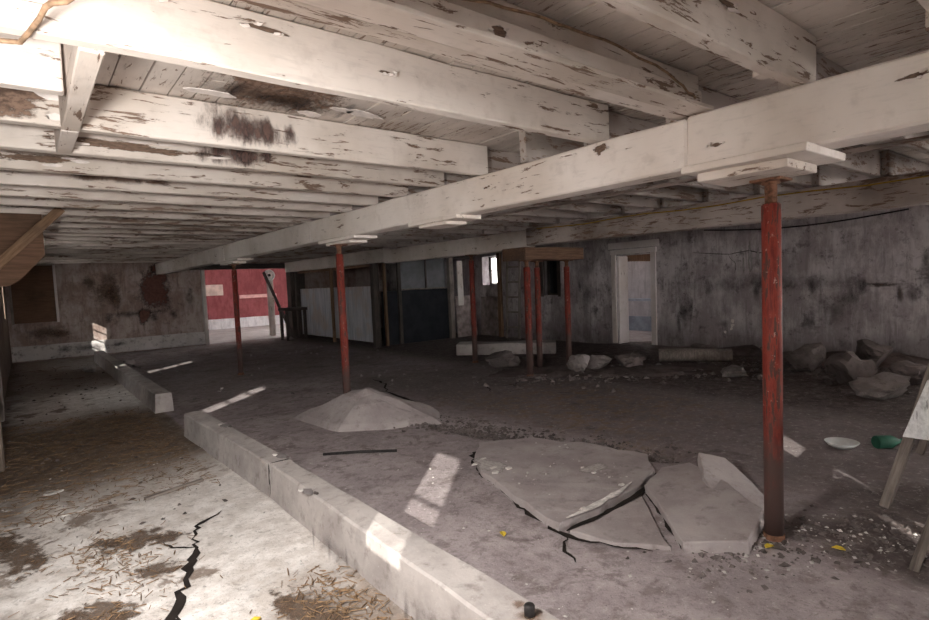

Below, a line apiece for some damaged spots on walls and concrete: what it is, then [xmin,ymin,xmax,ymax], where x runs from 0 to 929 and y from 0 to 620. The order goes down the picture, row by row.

peeling [488,25,510,39]
peeling [183,72,383,120]
damp [200,111,294,166]
flaking render [138,262,170,325]
crack [469,452,681,562]
crack [163,510,222,620]